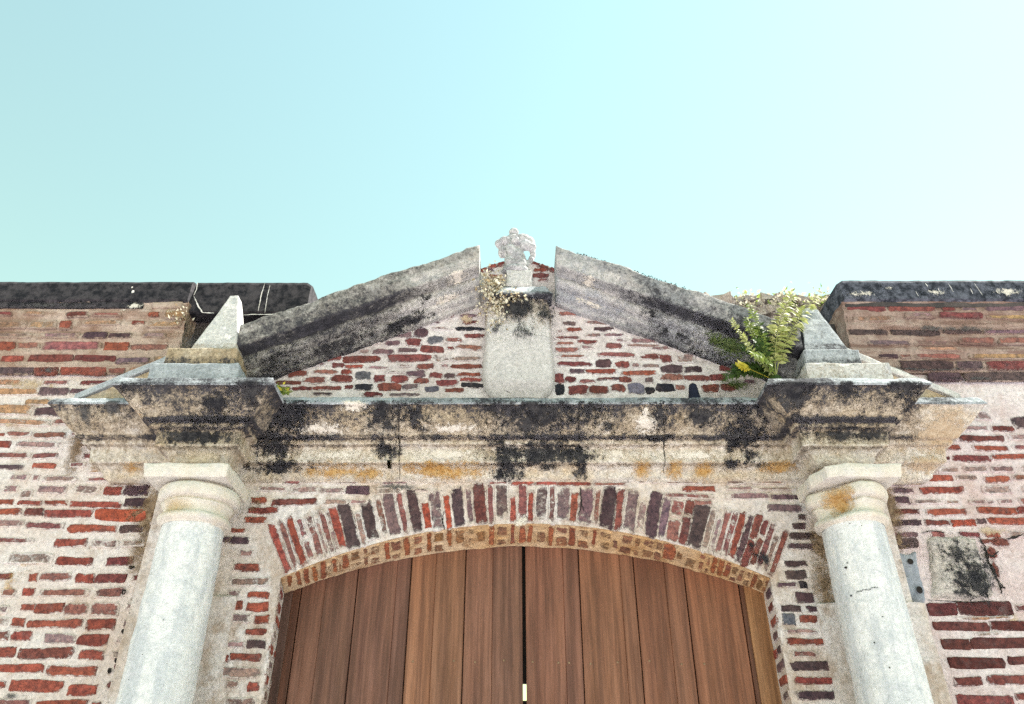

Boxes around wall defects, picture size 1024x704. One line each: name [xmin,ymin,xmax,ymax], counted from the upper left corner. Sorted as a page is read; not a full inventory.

damp [639,297,709,346]
damp [76,402,90,427]
damp [102,381,135,416]
damp [157,290,439,450]
damp [243,400,623,482]
damp [636,400,770,470]
damp [772,381,889,443]
damp [833,367,990,413]